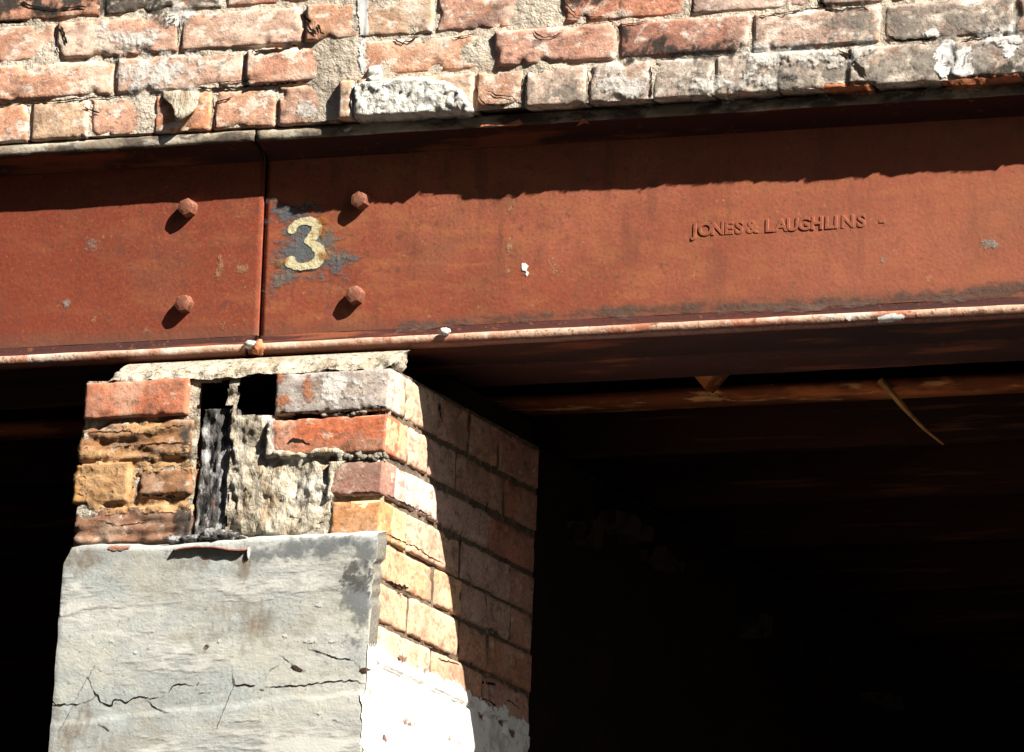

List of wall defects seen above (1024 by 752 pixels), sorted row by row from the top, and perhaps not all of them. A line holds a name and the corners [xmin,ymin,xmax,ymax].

peeling [245,473,313,518]
crack [53,648,366,734]